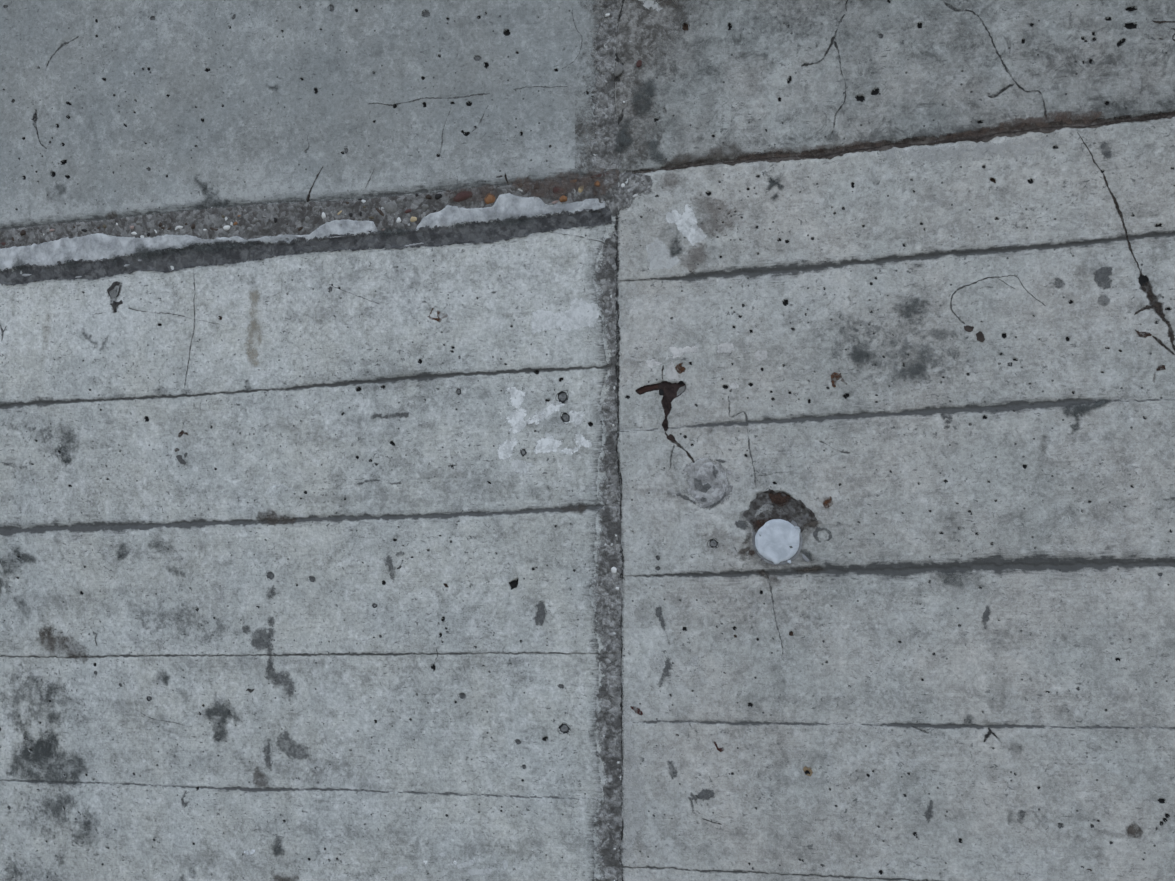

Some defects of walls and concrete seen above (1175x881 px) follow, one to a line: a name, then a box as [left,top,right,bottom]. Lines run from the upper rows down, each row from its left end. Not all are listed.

spalling [0,0,702,249]
crack [801,0,848,133]
crack [945,2,1047,119]
crack [1152,20,1175,41]
crack [950,275,1044,324]
crack [1077,132,1175,355]
spalling [735,489,818,556]